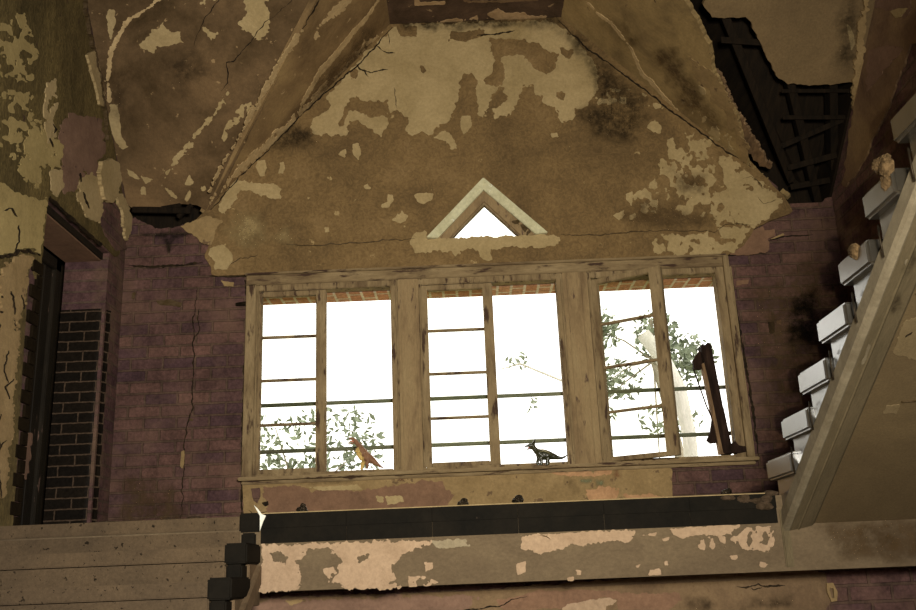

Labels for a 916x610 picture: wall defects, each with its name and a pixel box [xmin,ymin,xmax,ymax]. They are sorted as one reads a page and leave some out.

peeling [139,23,183,53]
peeling [164,0,631,287]
water stain [588,69,639,138]
peeling [585,1,791,256]
crack [0,208,41,259]
flaking render [0,0,161,498]
crack [0,291,25,328]
crack [0,351,14,450]
crack [129,255,257,518]
crack [240,351,267,513]
flaking render [251,479,454,513]
peeling [521,524,775,568]